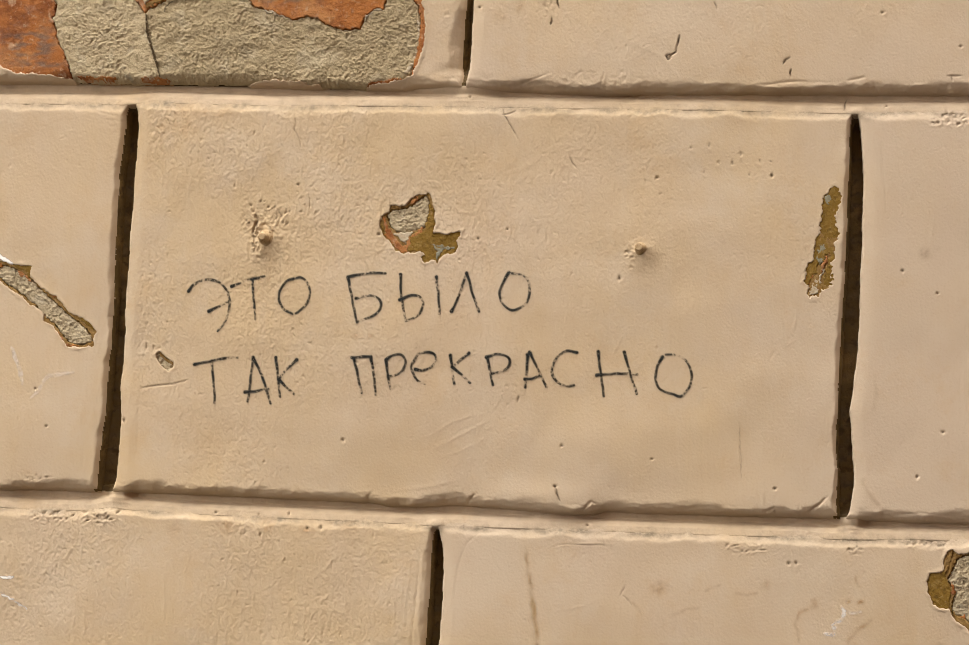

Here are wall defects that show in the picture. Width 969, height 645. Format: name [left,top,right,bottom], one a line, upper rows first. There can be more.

peeling [0,0,426,91]
peeling [380,193,460,263]
peeling [804,186,842,297]
peeling [0,261,97,348]
peeling [927,550,969,630]